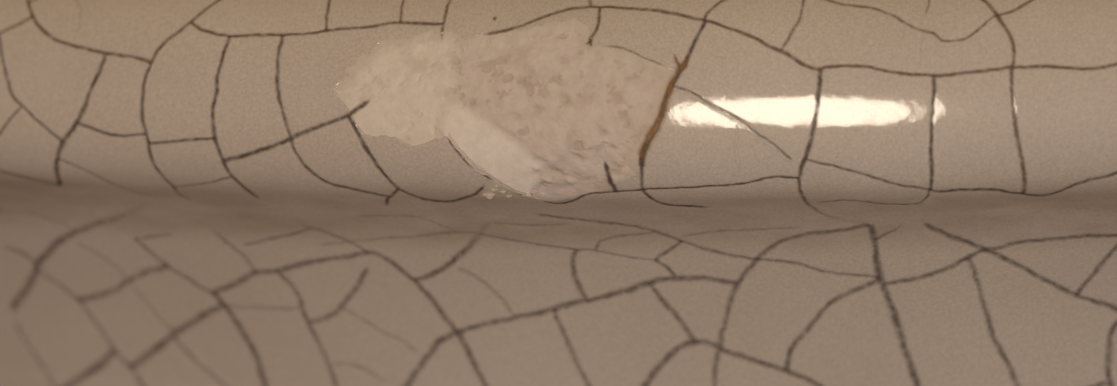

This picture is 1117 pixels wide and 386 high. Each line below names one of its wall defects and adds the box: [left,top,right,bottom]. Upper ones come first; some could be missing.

crack [0,0,483,202]
spalling [335,19,677,200]
crack [489,0,1117,219]
crack [13,234,72,307]
crack [69,259,323,385]
crack [354,225,1117,386]